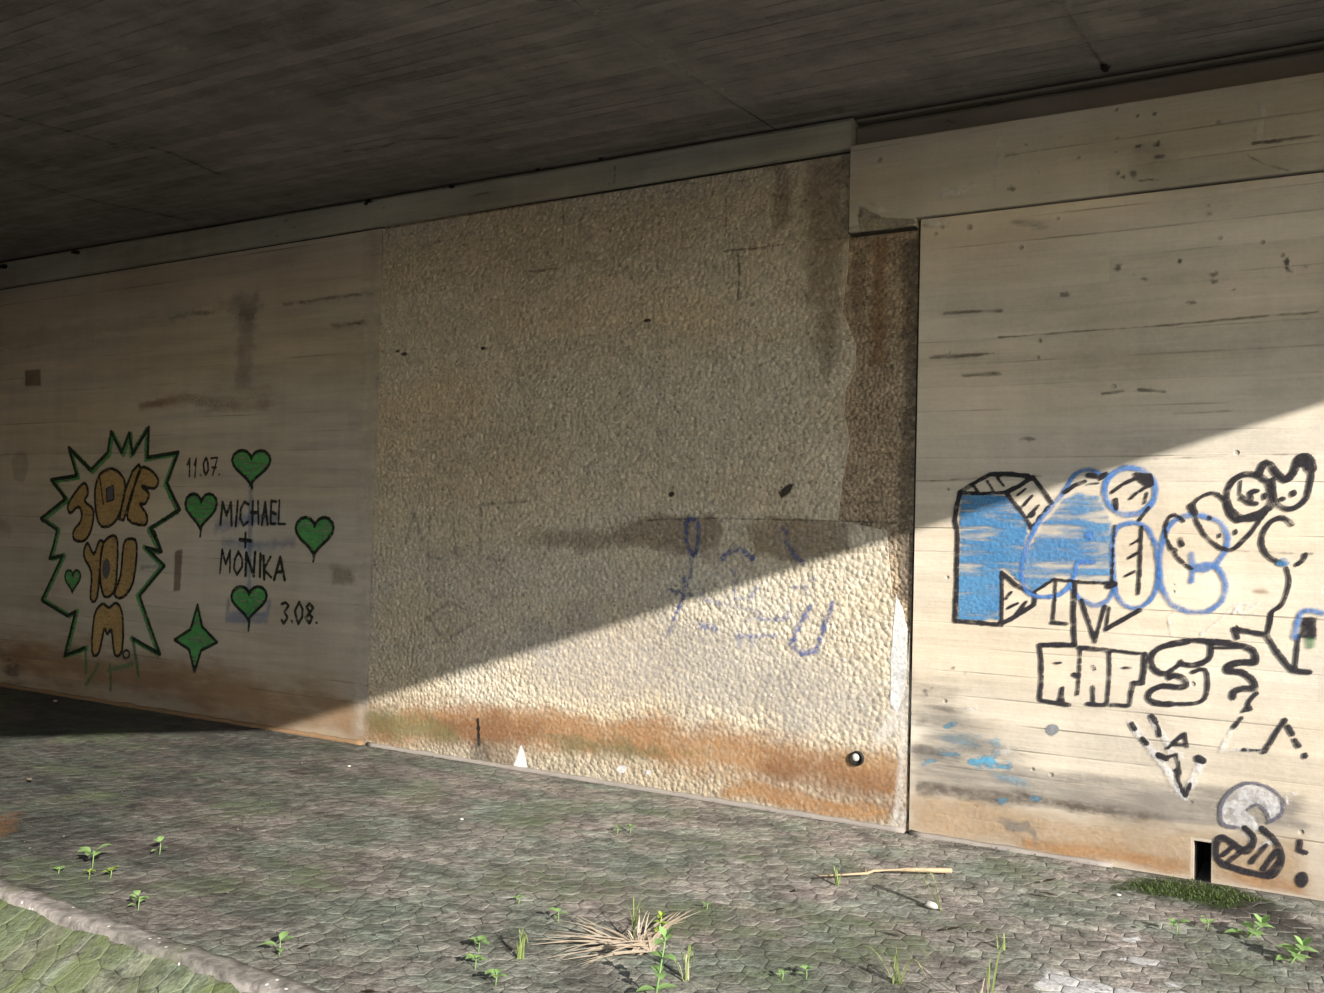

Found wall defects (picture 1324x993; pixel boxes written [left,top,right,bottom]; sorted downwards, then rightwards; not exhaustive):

corrosion [368,710,900,817]
water stain [1046,724,1059,735]